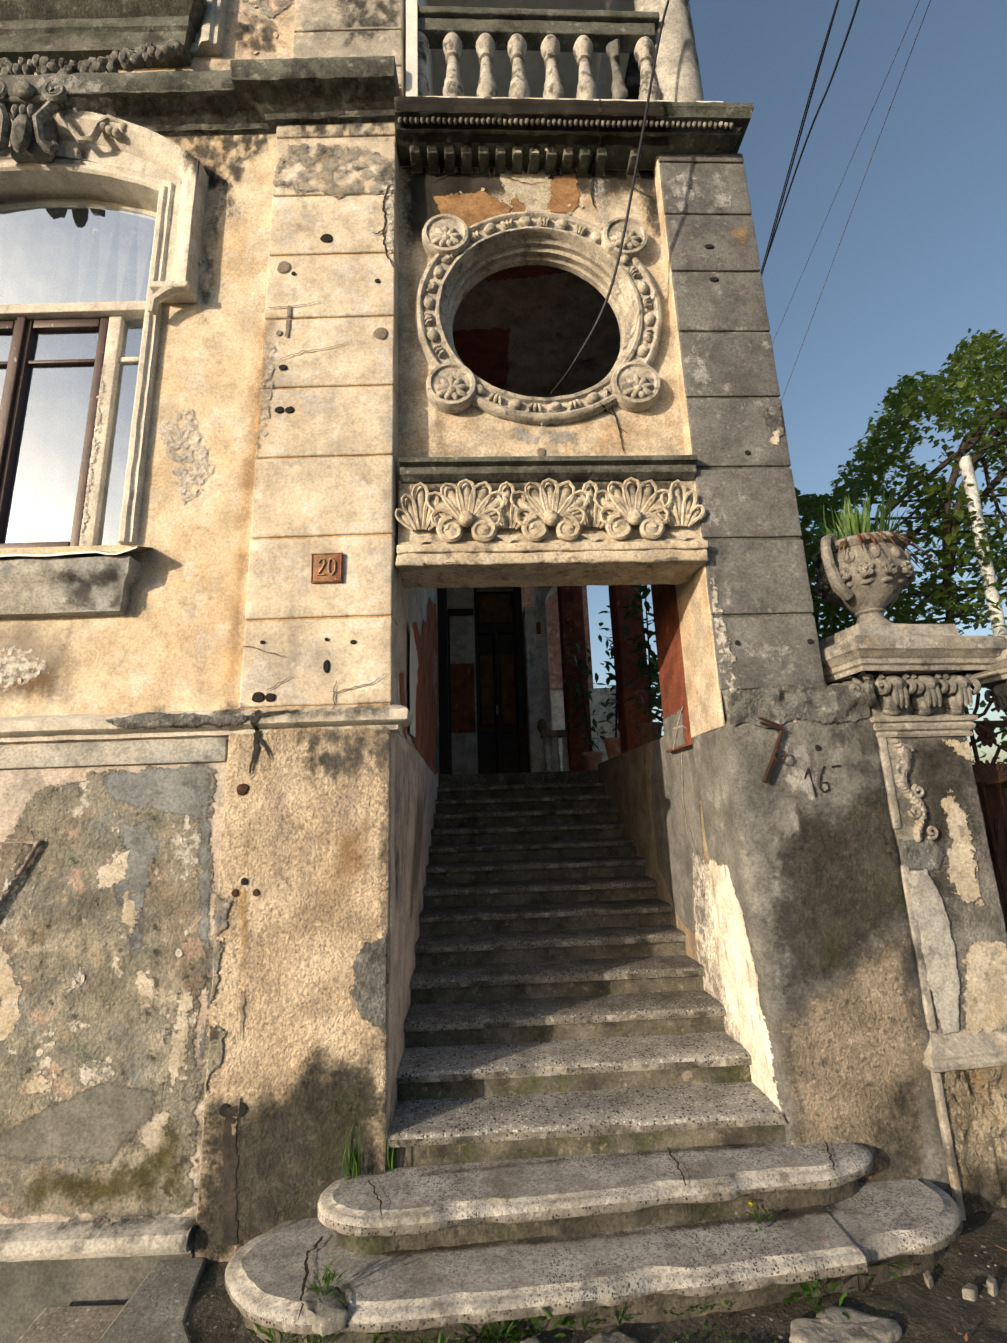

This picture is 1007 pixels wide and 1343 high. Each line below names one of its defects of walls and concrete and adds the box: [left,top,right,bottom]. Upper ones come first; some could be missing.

leakage [341,0,398,44]
leakage [284,57,387,138]
peeling [432,148,583,227]
crack [243,646,298,774]
crack [330,673,386,709]
peeling [400,598,439,774]
peeling [0,761,260,1235]
spalling [349,930,389,1033]
peeling [651,708,1007,1183]
leakage [182,1051,386,1263]
crack [667,1147,686,1186]
crack [299,1236,348,1317]